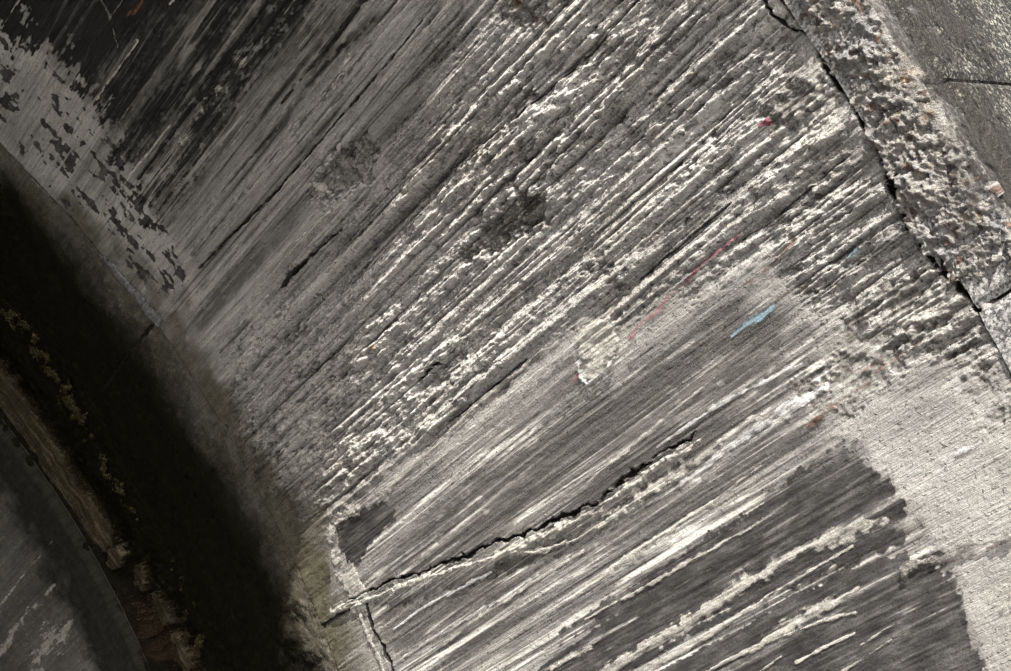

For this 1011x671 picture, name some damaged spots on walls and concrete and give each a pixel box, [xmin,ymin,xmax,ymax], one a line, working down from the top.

crack [762,0,806,34]
crack [820,54,865,129]
peeling [94,247,161,327]
crack [881,159,997,346]
water stain [0,419,150,671]
peeling [325,489,385,601]
crack [321,431,701,671]